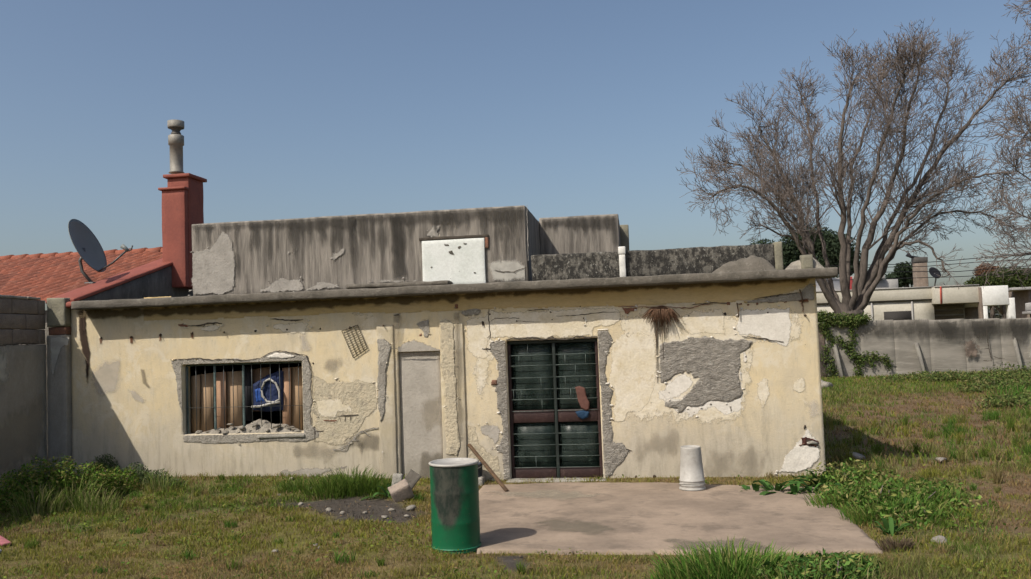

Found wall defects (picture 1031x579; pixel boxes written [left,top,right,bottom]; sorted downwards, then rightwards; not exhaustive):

damp [192,207,524,278]
damp [50,261,807,378]
peeling [312,399,352,427]
spalling [372,339,393,422]
spalling [407,283,819,480]